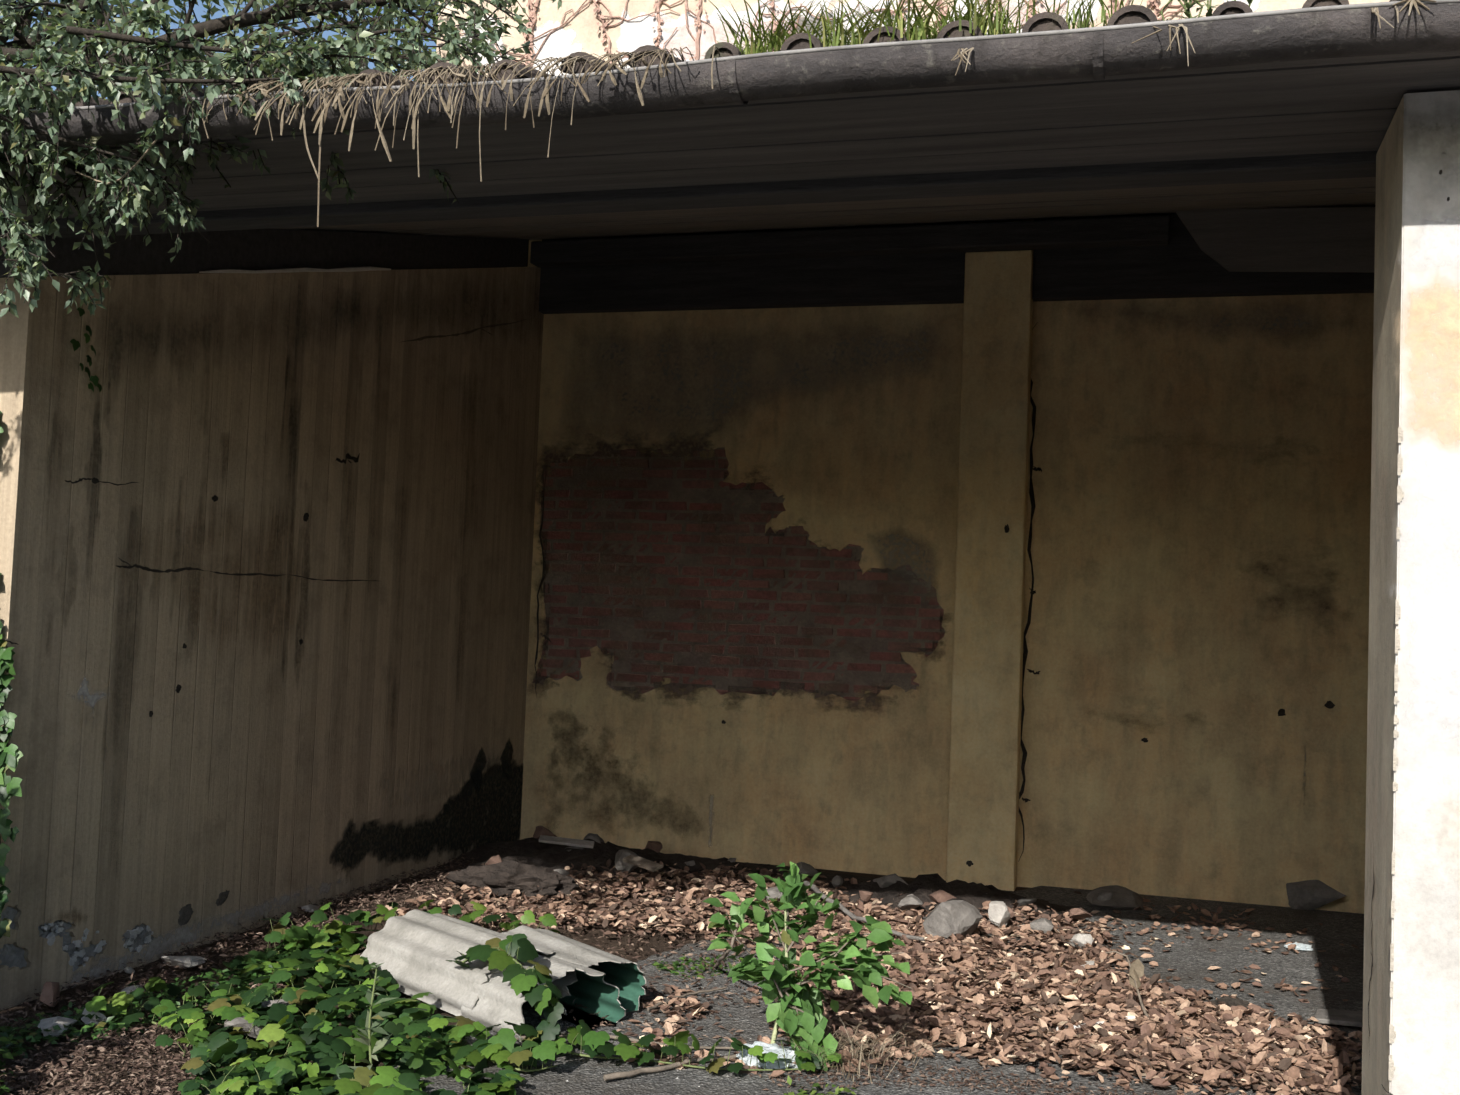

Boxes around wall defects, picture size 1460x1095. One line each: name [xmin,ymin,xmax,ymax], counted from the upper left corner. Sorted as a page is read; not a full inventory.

crack [65,478,138,486]
crack [116,557,376,581]
flaking render [533,432,945,709]
crack [1018,379,1042,862]
leakage [320,739,523,892]
spalling [38,920,154,972]